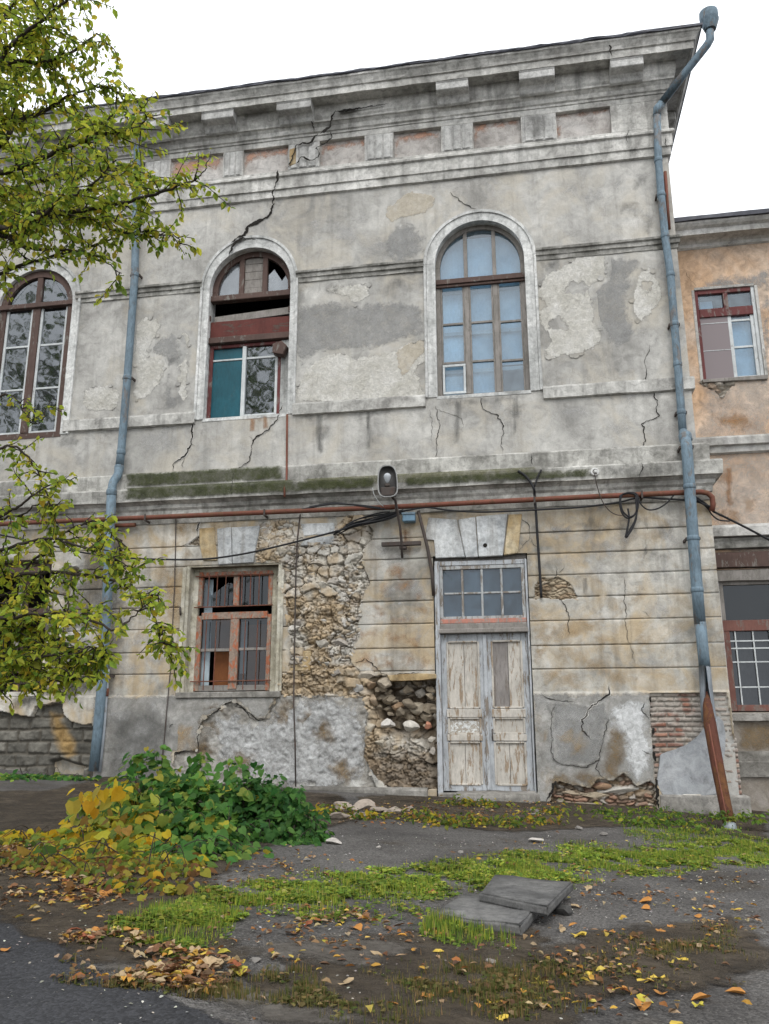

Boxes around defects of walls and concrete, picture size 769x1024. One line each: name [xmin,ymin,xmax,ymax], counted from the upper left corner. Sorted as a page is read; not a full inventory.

crack [229,104,385,255]
peeling [538,255,608,360]
peeling [628,266,662,324]
peeling [133,316,191,402]
crack [173,424,195,468]
crack [230,405,283,491]
crack [429,396,505,455]
crack [639,347,660,477]
flaking render [534,568,578,600]
crack [541,687,611,802]
flaking render [551,693,742,809]